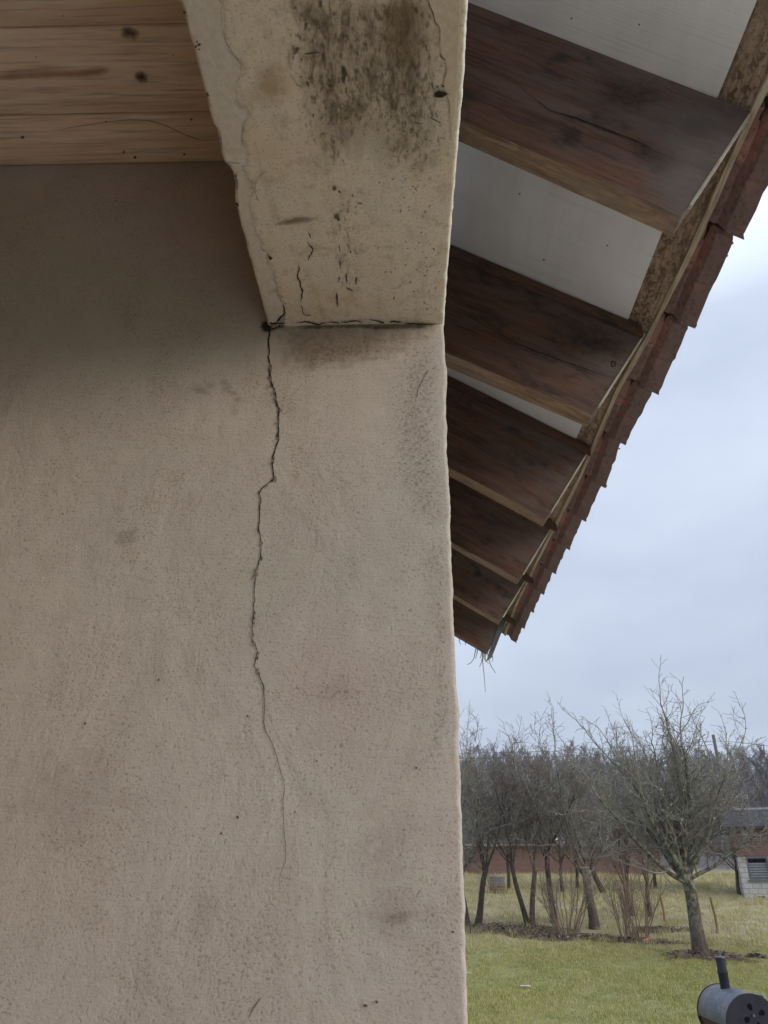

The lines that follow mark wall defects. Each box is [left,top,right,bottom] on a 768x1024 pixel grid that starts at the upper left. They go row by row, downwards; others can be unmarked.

damp [293,1,433,132]
crack [297,234,435,329]
crack [252,331,286,876]